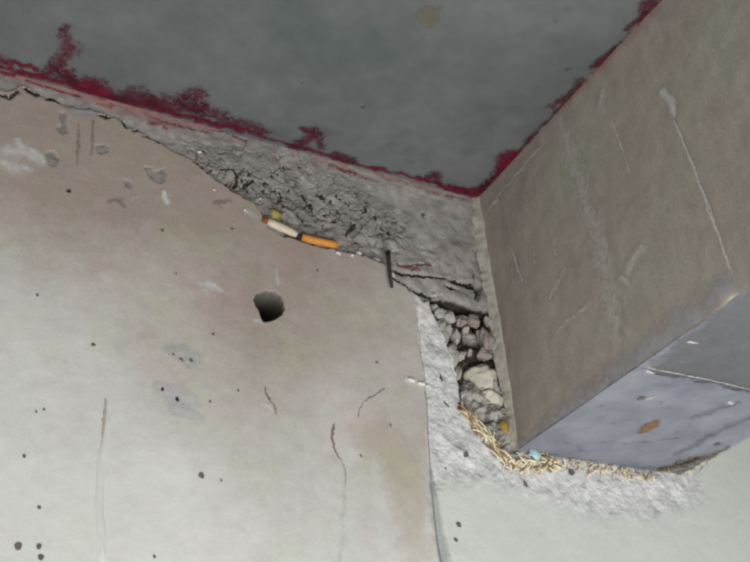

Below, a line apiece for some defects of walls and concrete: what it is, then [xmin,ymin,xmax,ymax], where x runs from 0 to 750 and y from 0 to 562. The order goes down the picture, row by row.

leakage [0,138,45,172]
leakage [328,160,474,207]
flaking render [0,72,717,534]
crack [393,260,489,333]
crack [264,386,277,416]
rust [637,420,660,434]
crack [331,424,346,481]